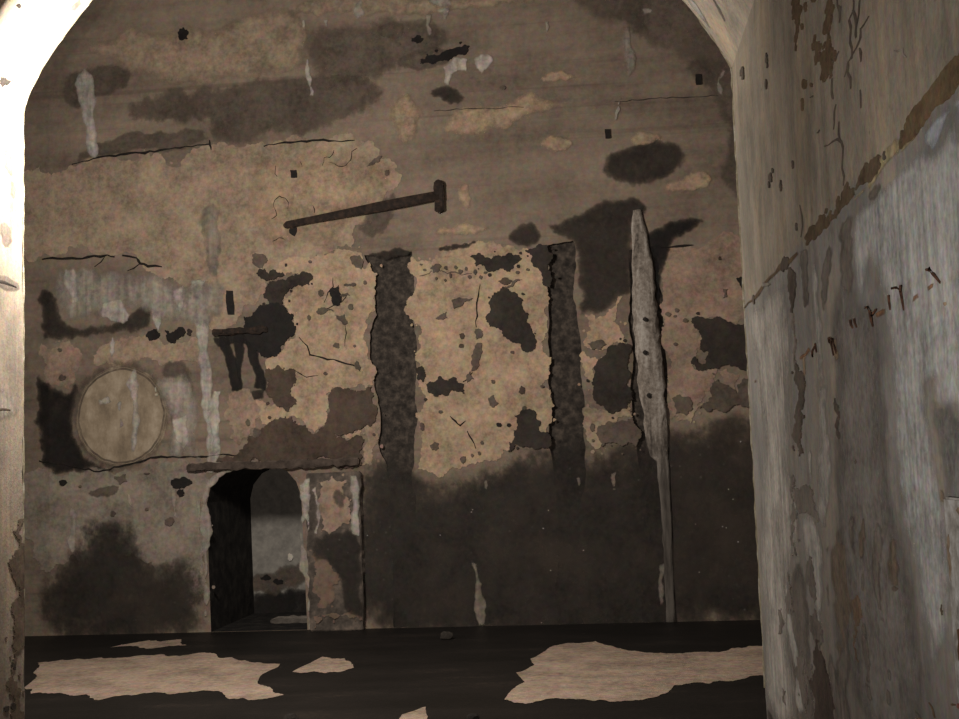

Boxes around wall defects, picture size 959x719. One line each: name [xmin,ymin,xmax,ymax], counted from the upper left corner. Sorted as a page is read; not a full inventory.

leakage [28,36,58,92]
crack [42,254,162,271]
crack [72,140,212,165]
leakage [65,0,554,163]
leakage [580,0,737,195]
spalling [791,0,837,111]
crack [810,0,869,186]
spalling [795,151,886,246]
spalling [899,54,959,149]
leakage [35,206,266,635]
leakage [253,94,959,719]
peeling [3,458,215,719]